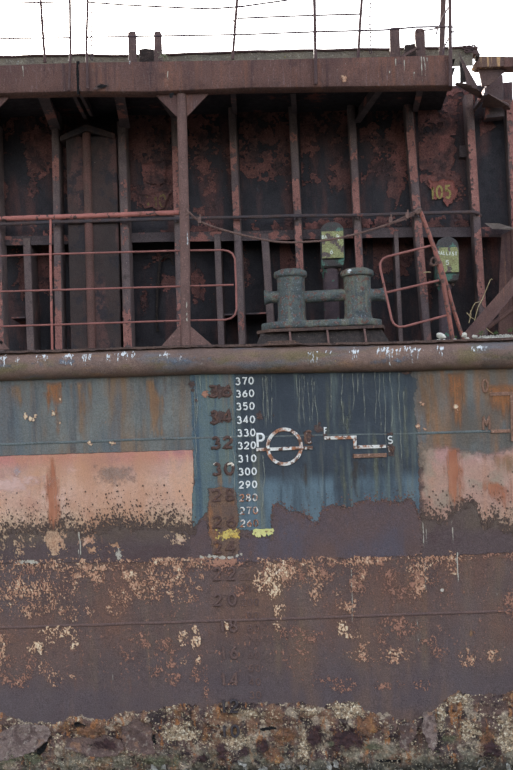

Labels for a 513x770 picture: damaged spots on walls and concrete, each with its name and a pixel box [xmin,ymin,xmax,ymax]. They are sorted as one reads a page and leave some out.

corrosion [46,460,58,525]
corrosion [447,450,461,505]
peeling [0,467,513,701]
corrosion [0,690,513,770]